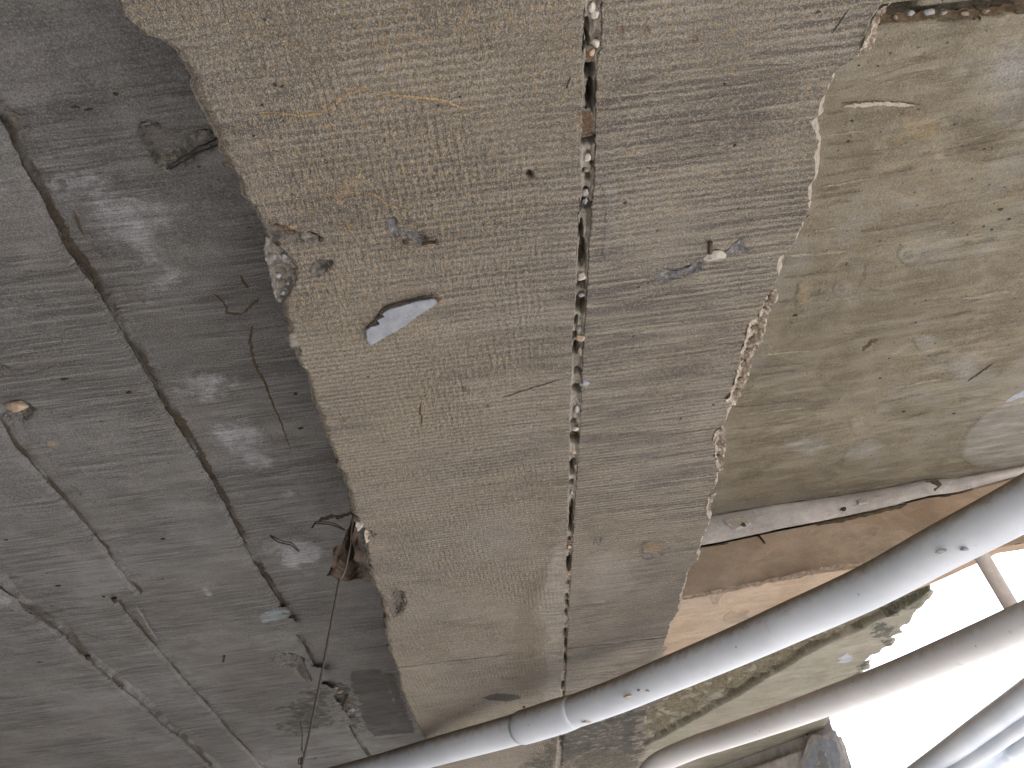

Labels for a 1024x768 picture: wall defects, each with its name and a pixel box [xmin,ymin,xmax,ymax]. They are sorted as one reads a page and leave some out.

spalling [858,2,891,56]
spalling [132,121,217,171]
crack [74,212,86,238]
spalling [264,217,334,302]
peeling [366,292,444,346]
crack [214,276,292,451]
crack [502,0,616,697]
spalling [726,289,779,405]
spalling [713,425,726,471]
spalling [389,589,407,617]
crack [555,734,563,768]